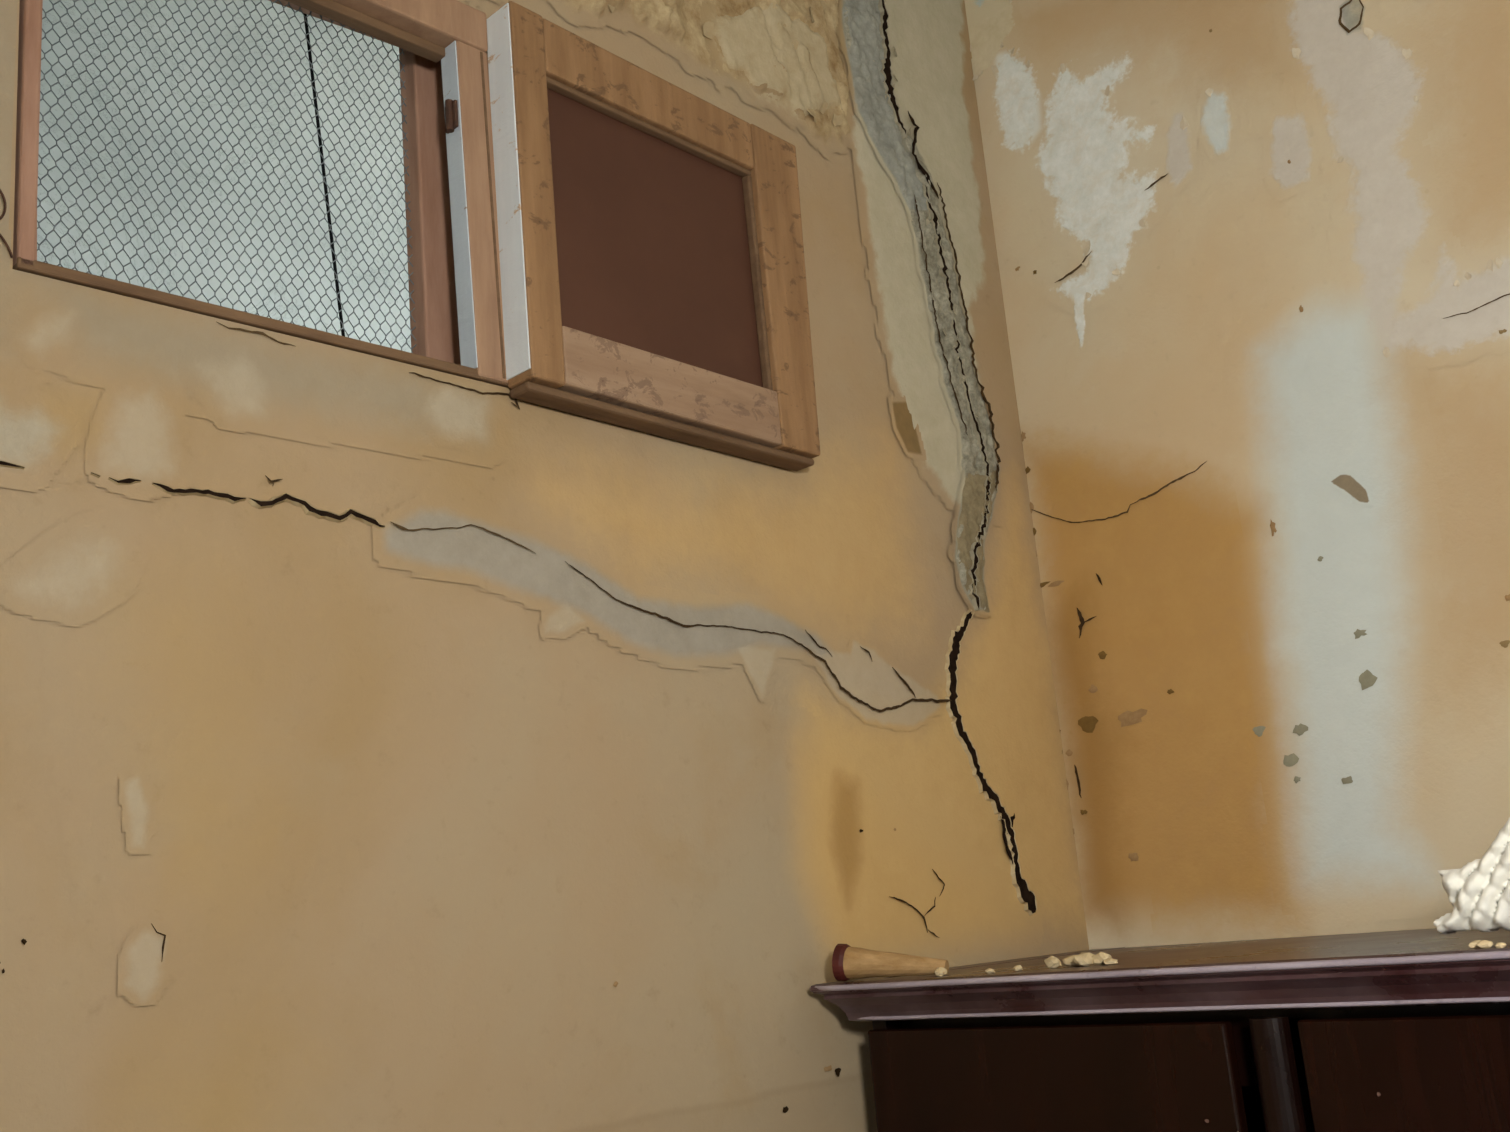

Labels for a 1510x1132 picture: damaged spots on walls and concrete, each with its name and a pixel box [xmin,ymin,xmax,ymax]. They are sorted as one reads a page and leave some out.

peeling [964,0,1240,314]
peeling [1261,0,1510,379]
crack [1055,252,1091,283]
peeling [547,0,1003,618]
crack [0,460,24,469]
crack [91,0,1037,915]
crack [1031,461,1207,523]
crack [1077,574,1102,638]
peeling [735,642,780,702]
peeling [807,637,944,732]
crack [1073,765,1081,797]
crack [889,869,945,938]